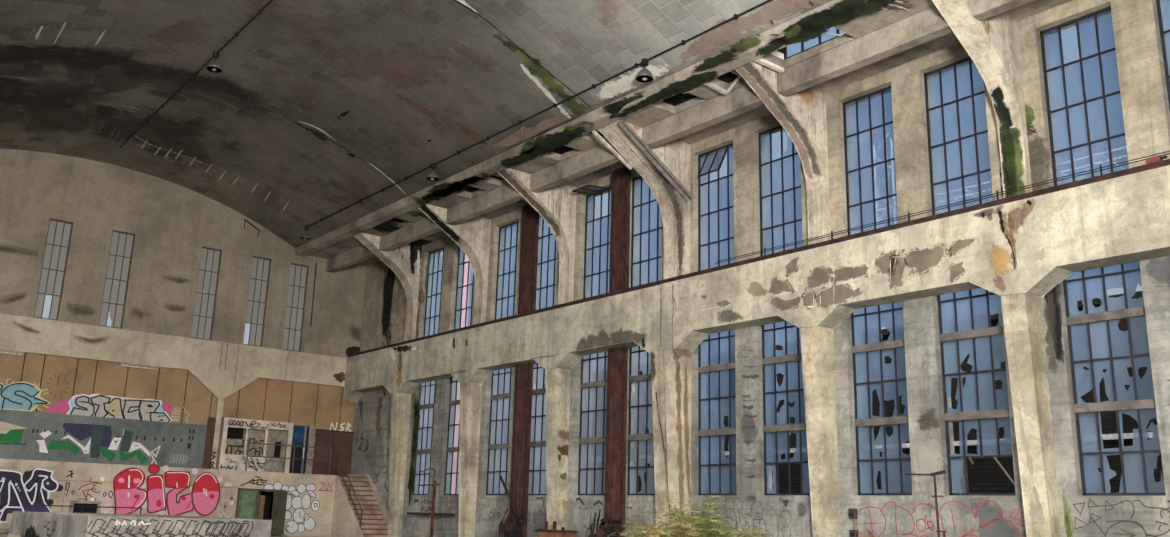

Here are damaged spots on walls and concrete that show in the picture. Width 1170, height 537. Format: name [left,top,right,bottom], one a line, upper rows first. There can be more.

water stain [0,20,237,94]
peeling [597,0,825,100]
water stain [0,76,240,184]
peeling [460,110,572,149]
spalling [748,237,976,311]